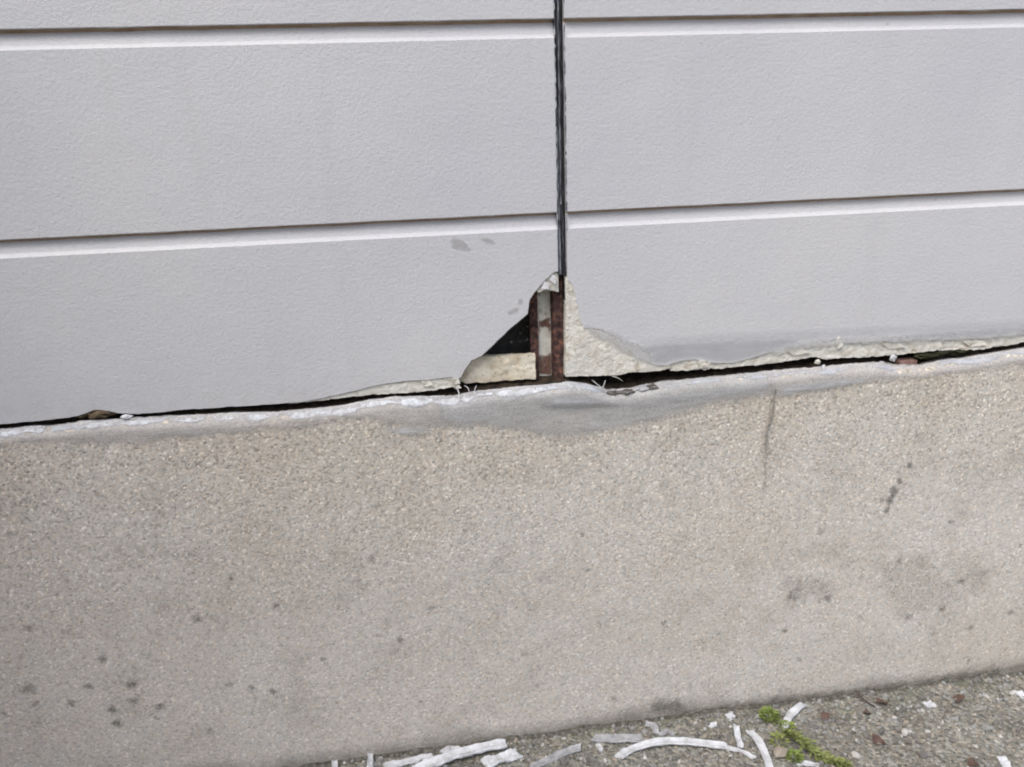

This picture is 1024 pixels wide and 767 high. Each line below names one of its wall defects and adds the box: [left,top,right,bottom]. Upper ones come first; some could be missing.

peeling [289,271,1024,404]